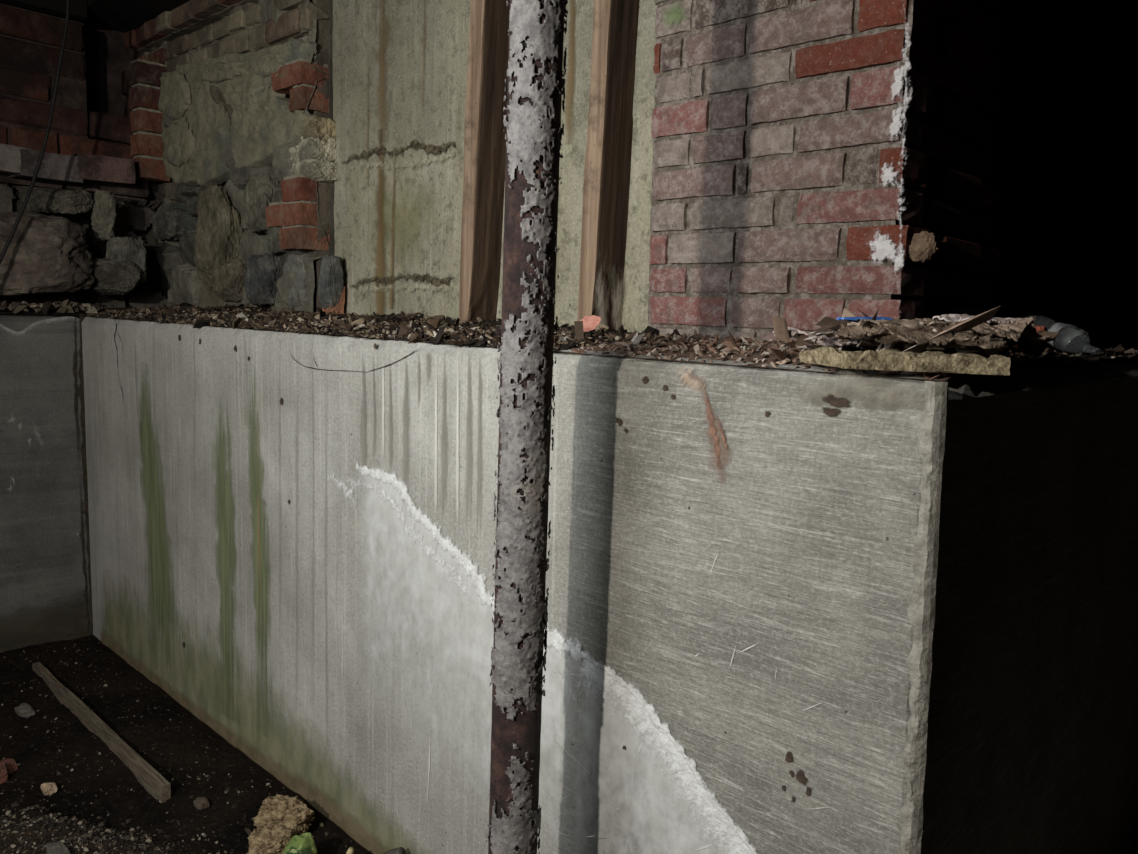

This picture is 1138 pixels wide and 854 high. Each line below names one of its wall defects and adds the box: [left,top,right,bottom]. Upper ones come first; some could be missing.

efflorescence [869,23,912,271]
leakage [0,316,78,335]
rust [681,369,728,473]
leakage [0,391,387,854]
leakage [328,355,495,779]
efflorescence [539,622,757,854]